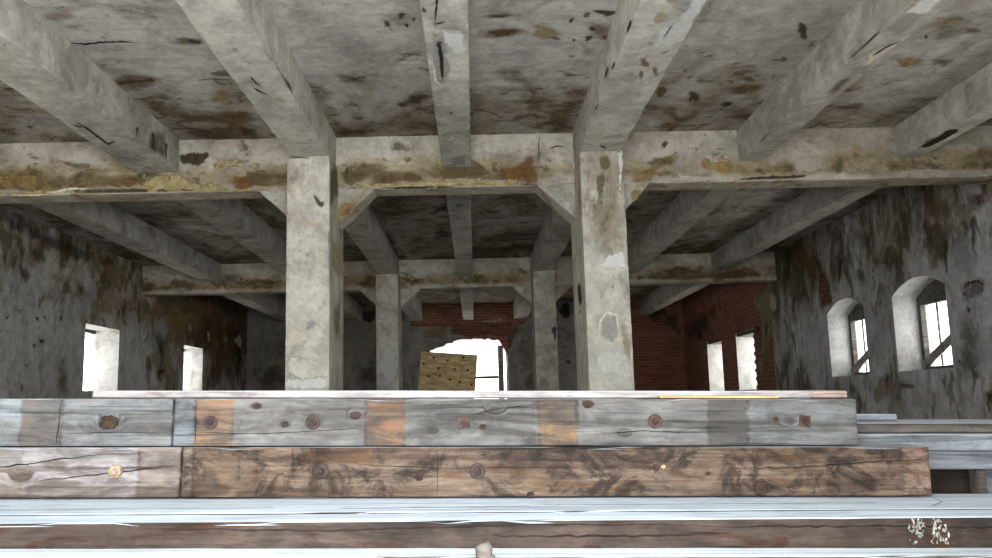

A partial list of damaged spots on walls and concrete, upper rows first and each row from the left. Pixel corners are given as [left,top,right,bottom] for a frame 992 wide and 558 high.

crack [72,39,137,47]
spalling [433,30,466,87]
peeling [864,0,940,64]
peeling [596,252,626,268]
water stain [914,185,951,271]
water stain [147,298,244,390]
peeling [598,311,631,386]